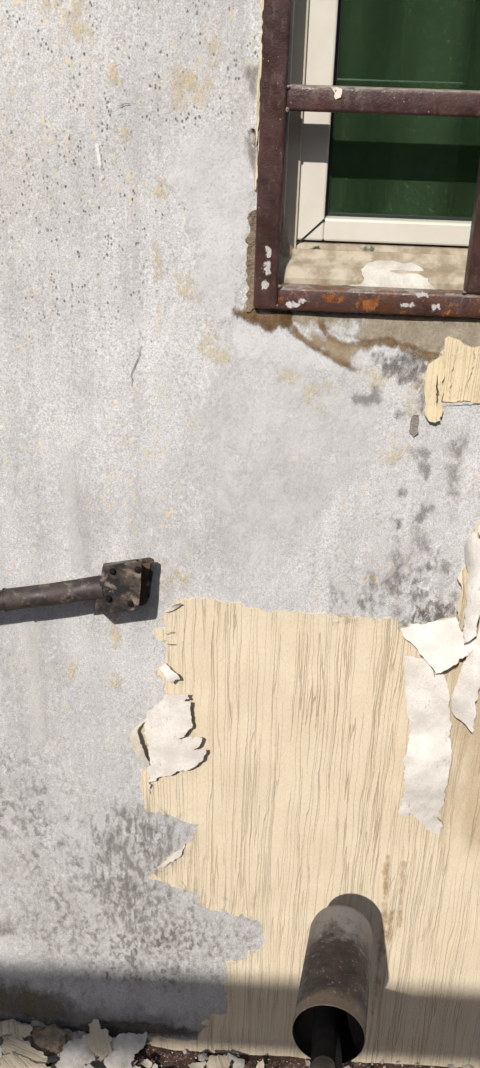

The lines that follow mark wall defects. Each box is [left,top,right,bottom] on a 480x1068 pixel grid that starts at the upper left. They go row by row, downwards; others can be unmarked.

rust [233,308,292,331]
water stain [290,314,437,383]
water stain [353,389,379,403]
water stain [392,563,455,623]
peeling [398,526,480,834]
peeling [130,663,207,795]
water stain [102,811,159,934]
water stain [0,985,92,1029]